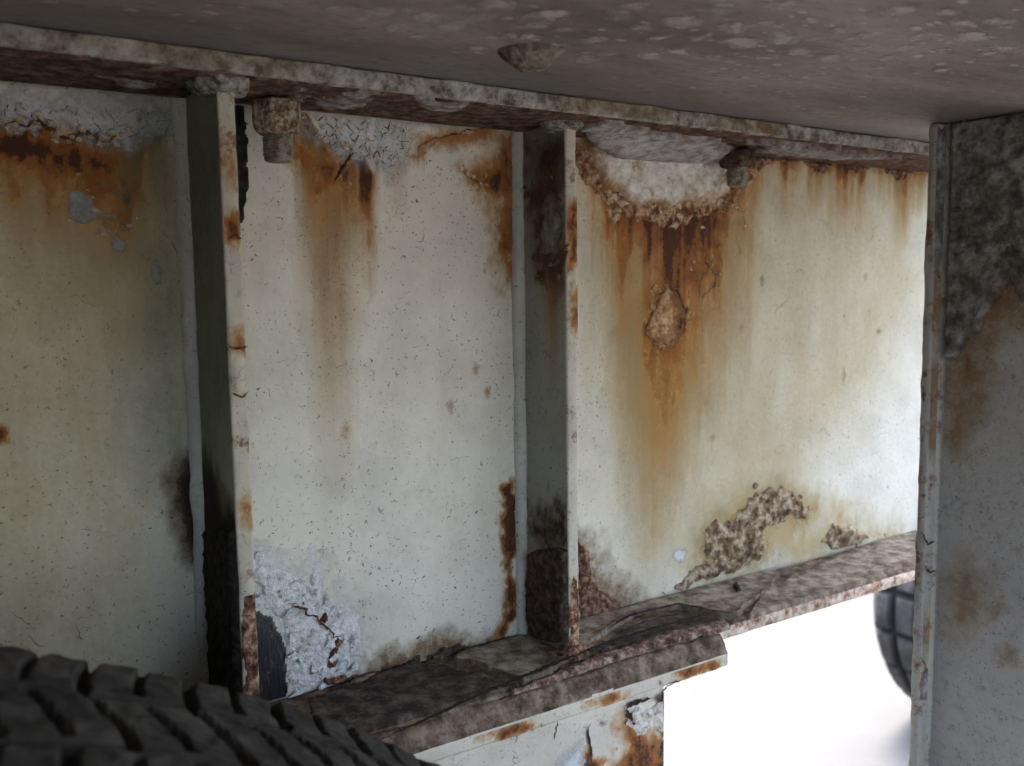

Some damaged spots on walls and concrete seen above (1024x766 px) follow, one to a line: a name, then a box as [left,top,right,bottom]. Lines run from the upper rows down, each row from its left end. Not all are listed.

peeling [575,120,906,230]
rust [0,47,929,487]
peeling [254,546,378,698]
rust [270,479,917,733]
peeling [626,701,664,736]